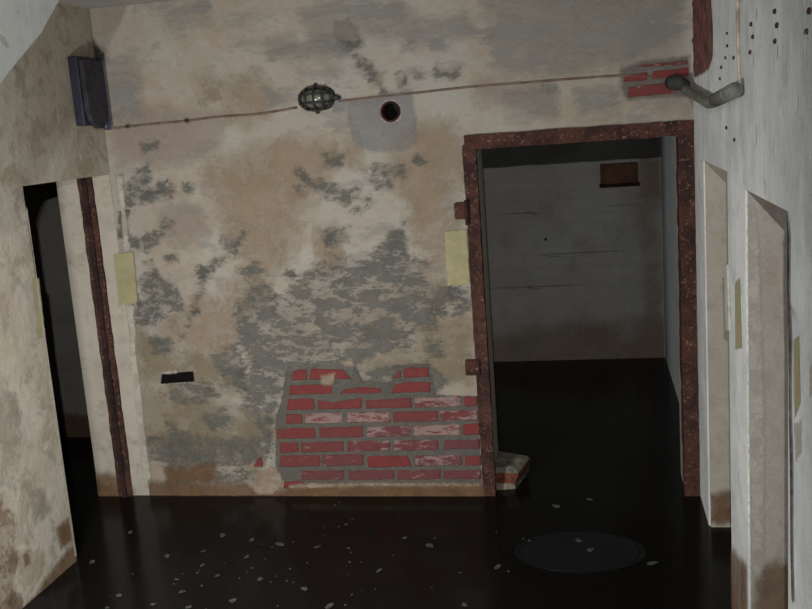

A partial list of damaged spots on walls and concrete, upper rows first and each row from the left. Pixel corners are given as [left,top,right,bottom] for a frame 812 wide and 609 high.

flaking render [622,0,713,99]
damp [392,125,464,252]
flaking render [26,210,77,556]
damp [138,276,263,392]
flaking render [126,222,481,495]
damp [502,325,664,361]
damp [144,394,486,496]
damp [37,518,77,595]